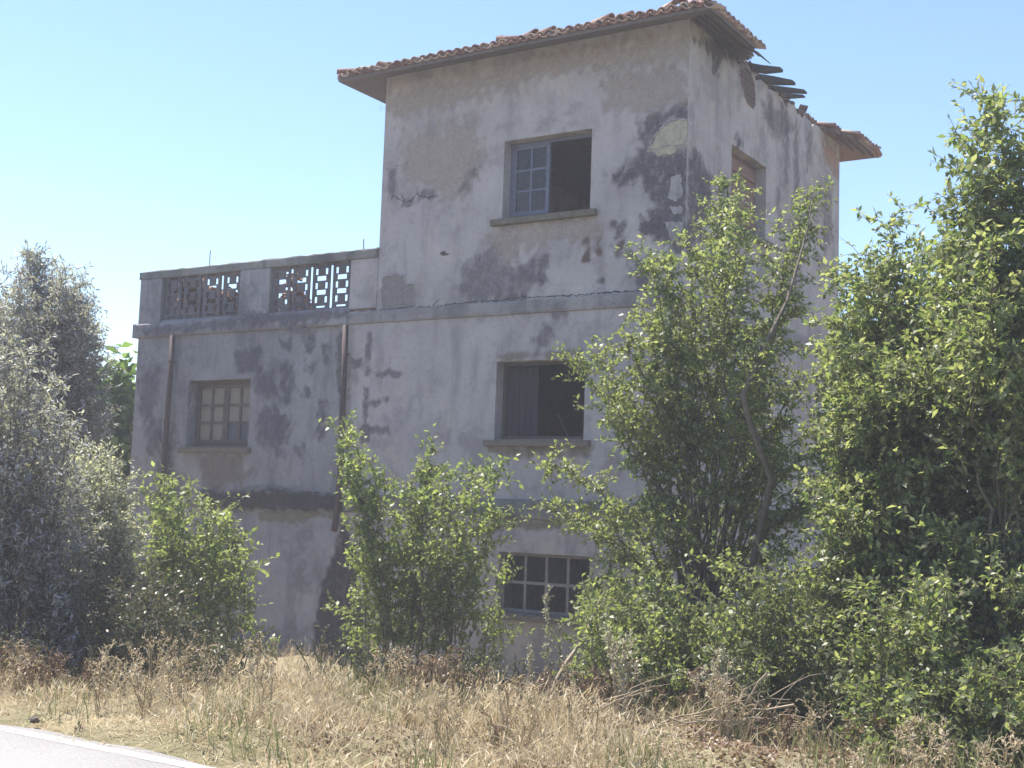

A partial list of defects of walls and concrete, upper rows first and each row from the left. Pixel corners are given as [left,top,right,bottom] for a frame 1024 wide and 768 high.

crack [391,163,436,202]
damp [460,220,653,303]
damp [387,34,738,253]
peeling [647,117,692,157]
damp [144,296,400,457]
damp [200,456,364,666]